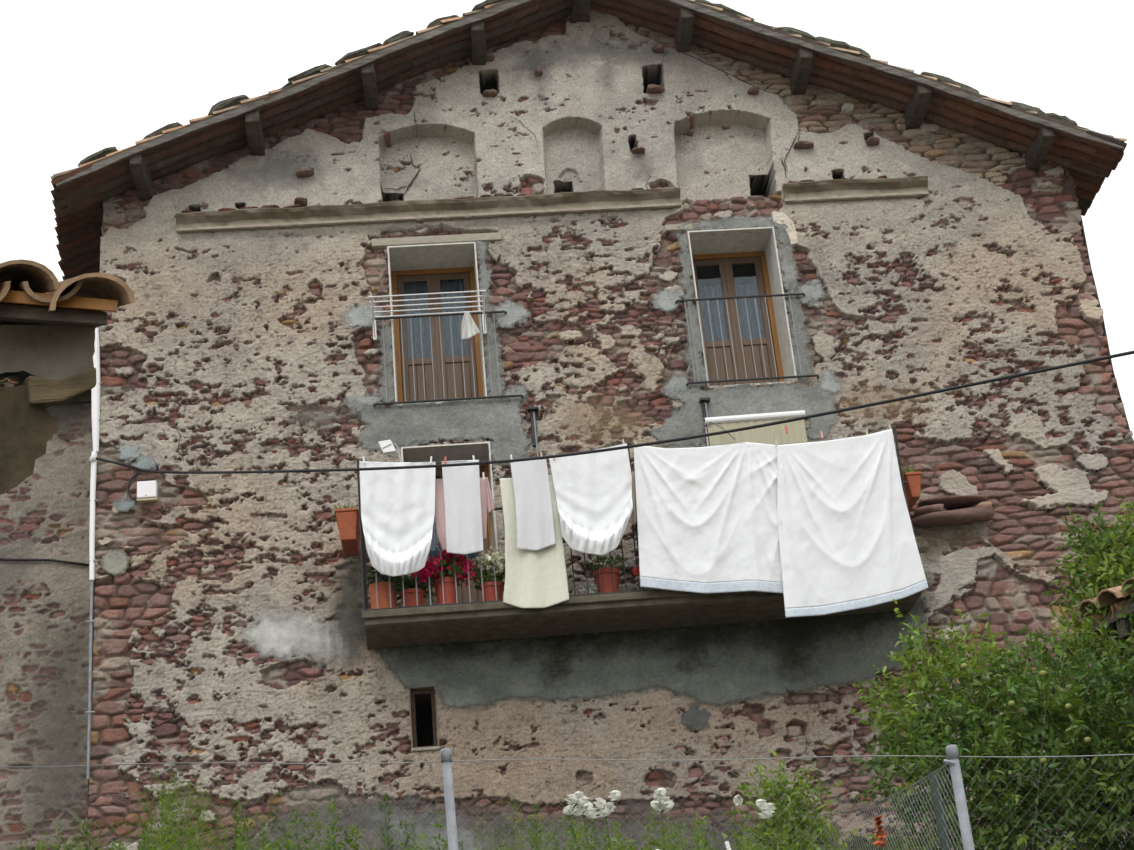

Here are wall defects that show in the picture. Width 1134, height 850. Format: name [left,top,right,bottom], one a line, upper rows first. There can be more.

flaking render [486,15,571,54]
flaking render [265,55,471,149]
flaking render [102,145,250,236]
flaking render [519,176,544,195]
flaking render [100,348,147,399]
flaking render [308,282,323,297]
flaking render [484,246,593,372]
flaking render [602,339,632,369]
flaking render [645,193,867,387]
flaking render [690,43,1134,719]
flaking render [95,444,208,560]
flaking render [88,573,913,850]